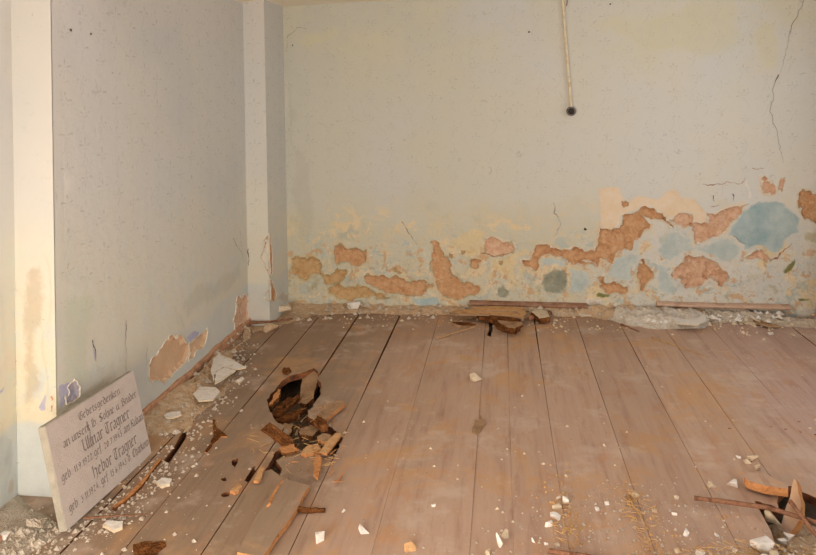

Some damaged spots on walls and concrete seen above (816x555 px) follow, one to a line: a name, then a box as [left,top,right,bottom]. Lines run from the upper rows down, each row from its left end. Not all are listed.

spalling [261,233,277,302]
spalling [289,173,816,306]
spalling [232,294,249,330]
spalling [148,328,208,383]